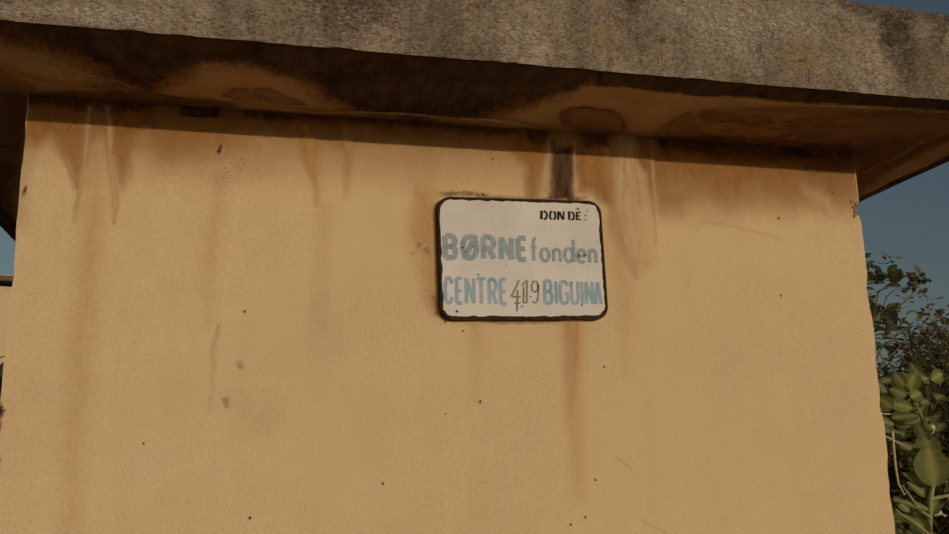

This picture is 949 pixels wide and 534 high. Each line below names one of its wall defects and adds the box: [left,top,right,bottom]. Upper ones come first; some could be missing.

leakage [0,0,949,272]